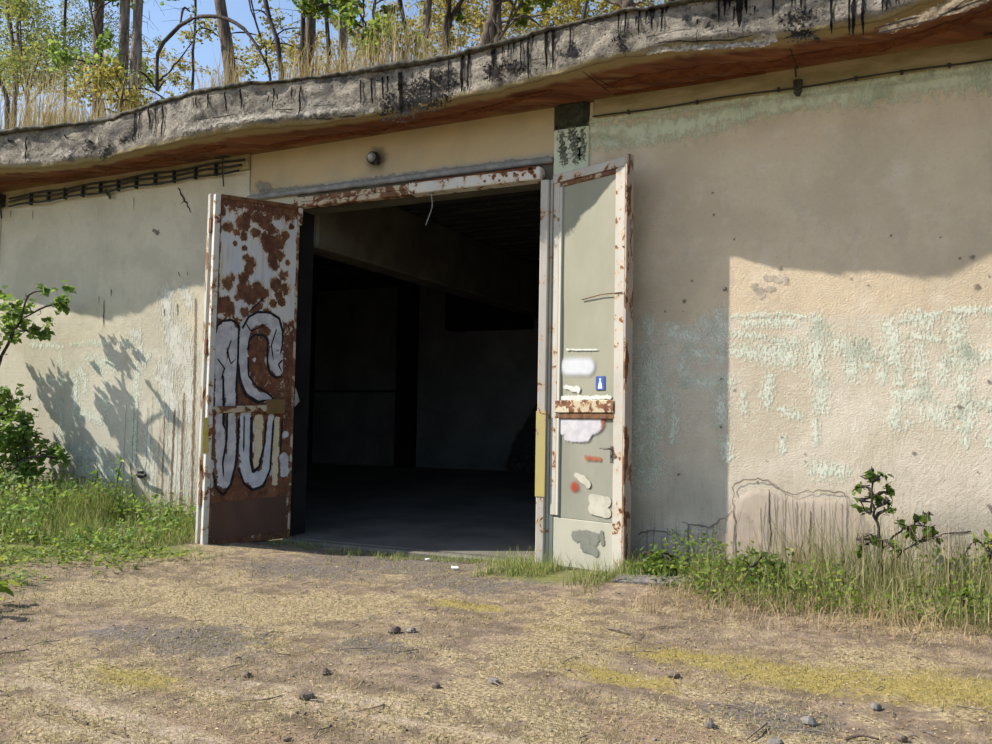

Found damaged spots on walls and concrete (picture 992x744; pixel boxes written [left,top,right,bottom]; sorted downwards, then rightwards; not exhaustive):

leakage [617,6,669,36]
leakage [718,0,756,27]
leakage [848,0,865,37]
leakage [360,76,389,104]
leakage [447,53,471,92]
leakage [489,30,555,83]
leakage [132,104,164,141]
leakage [255,159,527,194]
corrosion [410,166,536,184]
corrosion [161,298,196,505]
crack [638,478,847,560]